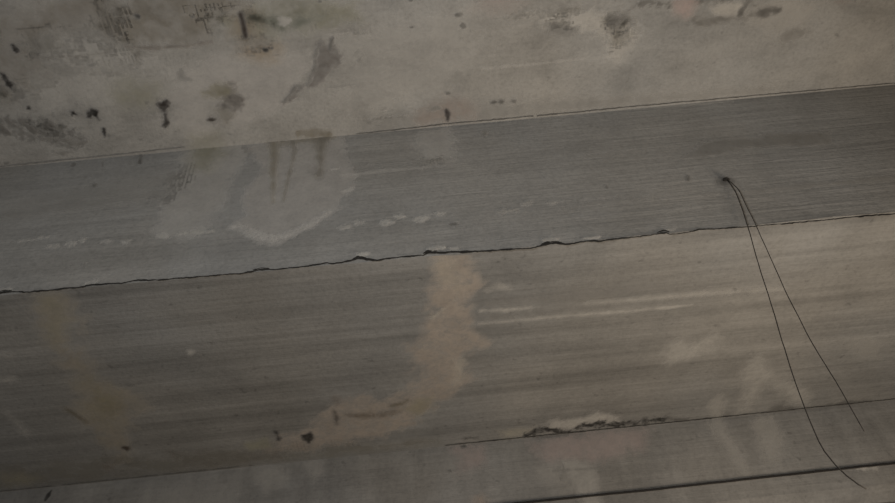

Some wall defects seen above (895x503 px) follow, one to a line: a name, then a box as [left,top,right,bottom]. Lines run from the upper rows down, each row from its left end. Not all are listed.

water stain [158,136,358,246]
corrosion [270,130,333,200]
crack [0,213,895,294]
spalling [507,412,689,438]